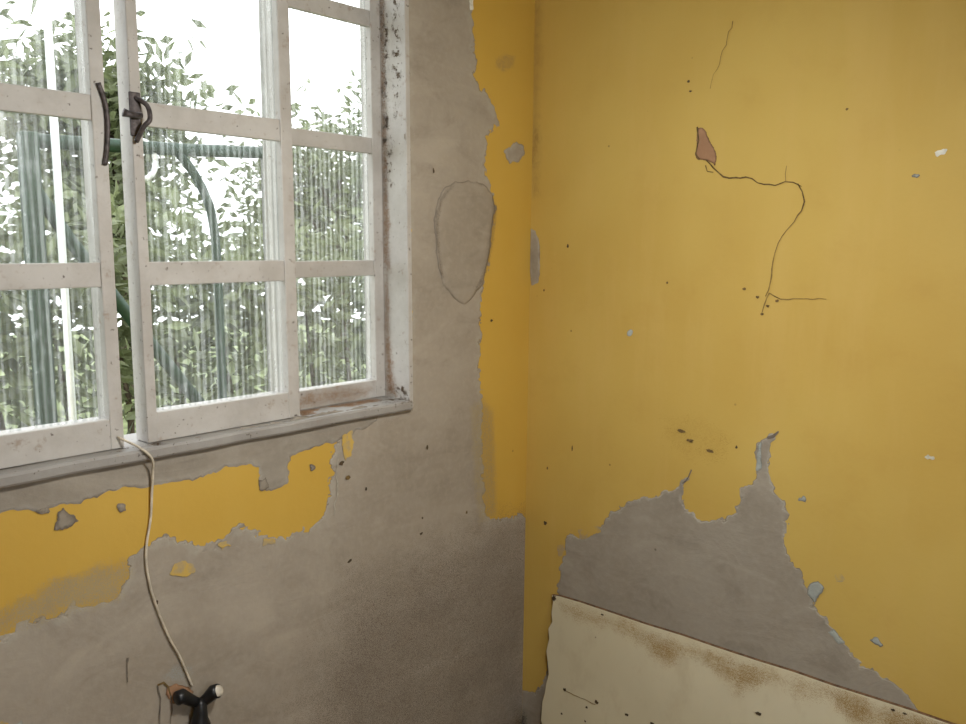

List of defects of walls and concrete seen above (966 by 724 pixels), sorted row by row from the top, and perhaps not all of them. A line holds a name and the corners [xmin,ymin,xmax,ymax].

peeling [0,0,549,724]
crack [705,159,823,315]
peeling [556,431,919,711]